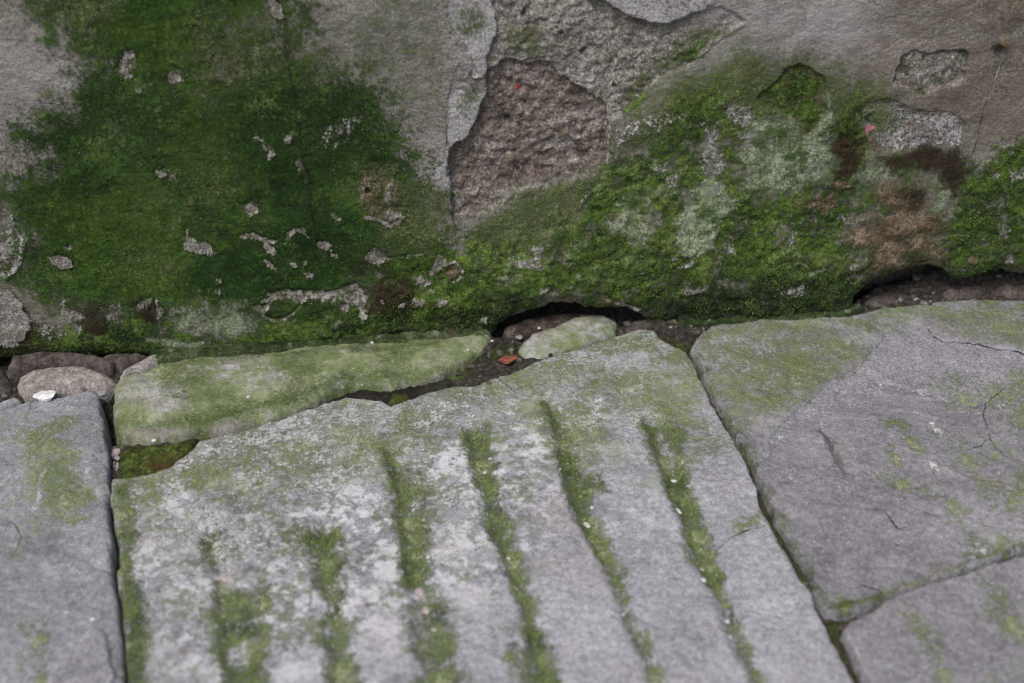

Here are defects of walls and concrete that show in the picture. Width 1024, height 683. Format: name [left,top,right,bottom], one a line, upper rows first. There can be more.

spalling [433,0,745,239]
crack [876,54,1003,166]
crack [928,330,1024,355]
crack [969,384,1008,457]